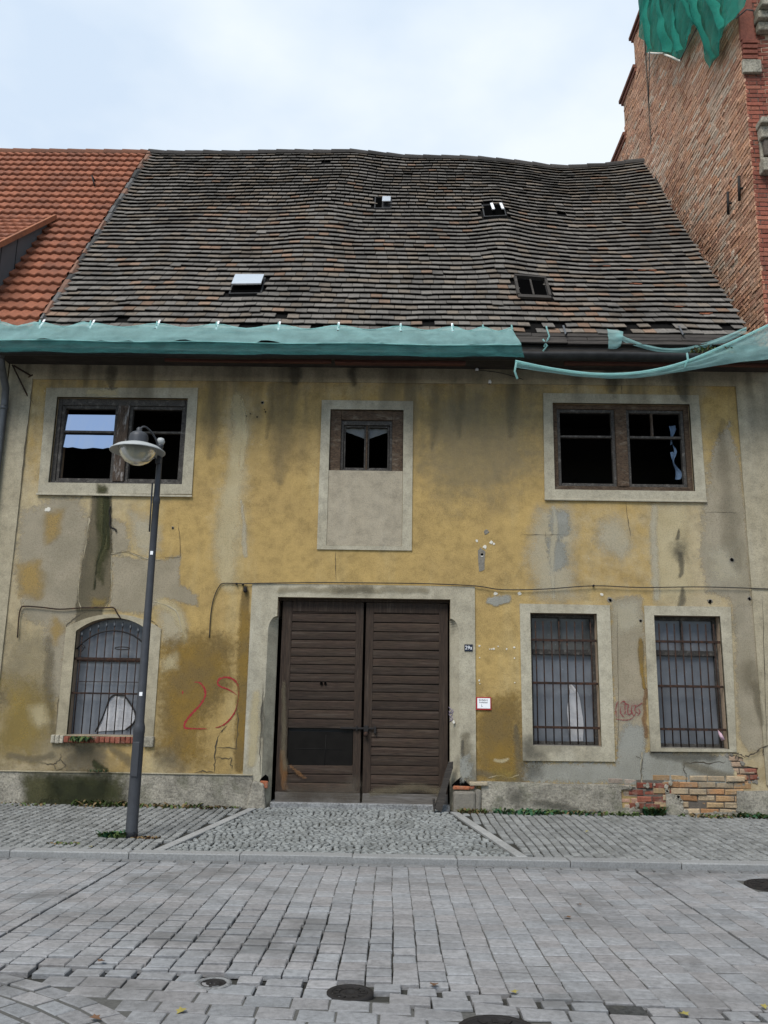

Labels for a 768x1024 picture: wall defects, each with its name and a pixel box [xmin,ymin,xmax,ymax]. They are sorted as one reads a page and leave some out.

damp [76,496,112,630]
peeling [105,514,197,647]
peeling [531,506,572,598]
peeling [608,423,763,815]
crack [759,598,767,674]
crack [196,695,265,789]
crack [683,699,768,782]